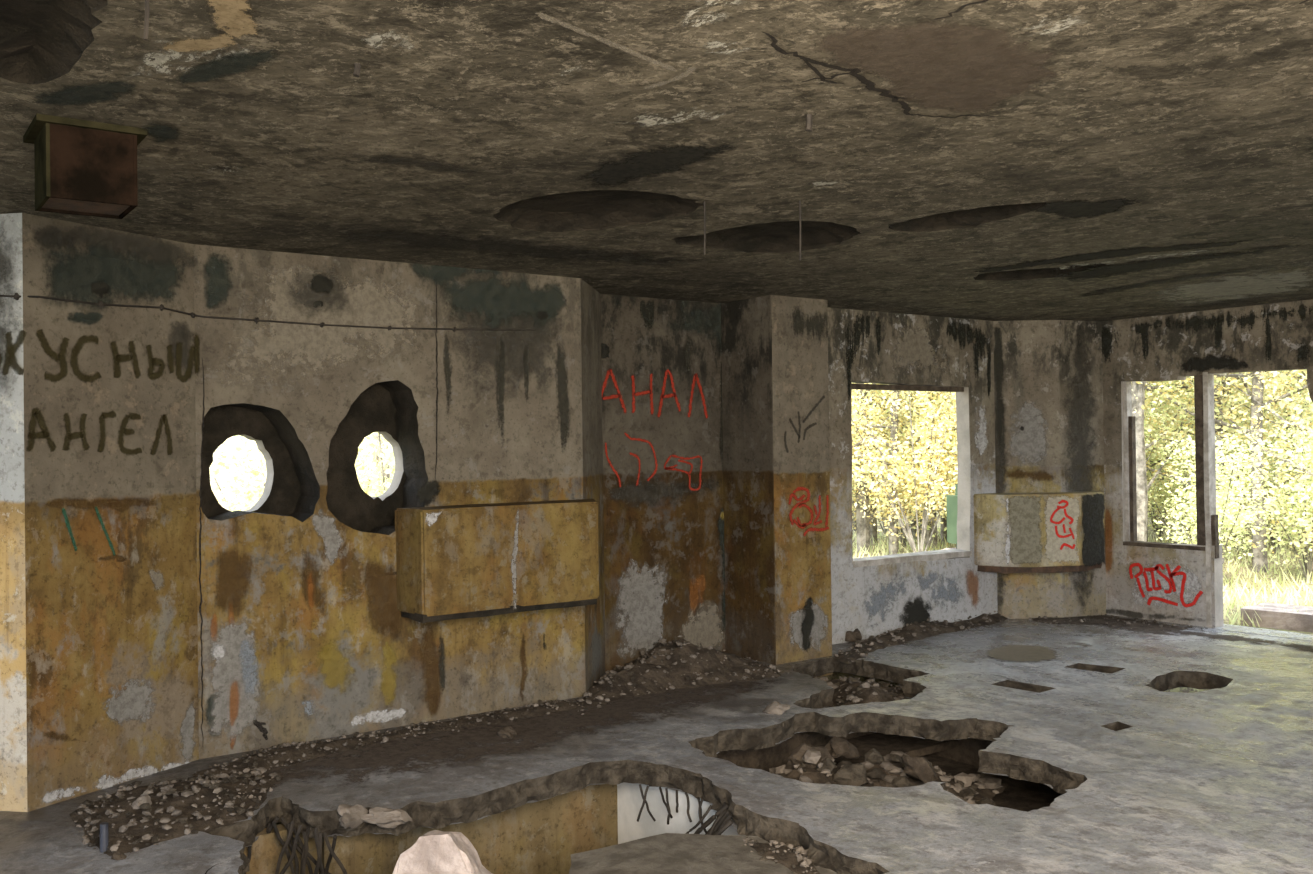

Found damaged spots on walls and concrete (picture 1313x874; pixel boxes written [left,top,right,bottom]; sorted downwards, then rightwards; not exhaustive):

crack [763,32,997,118]
damp [47,241,185,325]
damp [204,253,233,309]
damp [443,276,570,448]
damp [791,308,828,340]
damp [844,313,881,404]
damp [1065,304,1313,492]
damp [1073,571,1094,607]
peeling [96,619,260,789]
peeling [43,787,80,803]